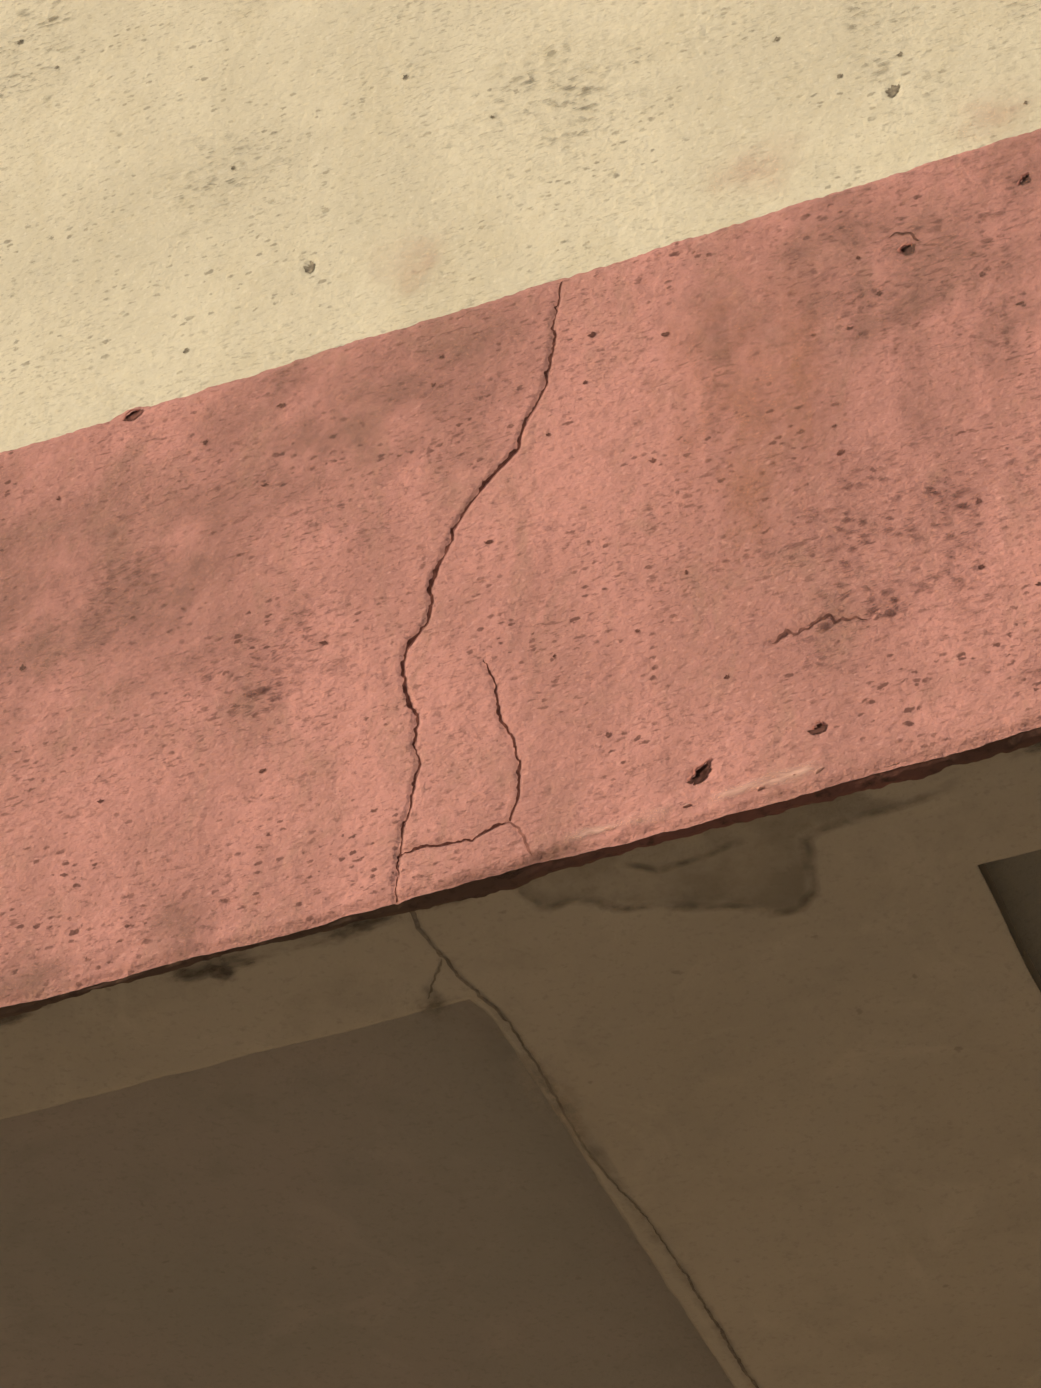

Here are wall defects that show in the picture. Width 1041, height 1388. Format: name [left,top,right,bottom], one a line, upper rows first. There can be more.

crack [395,281,759,1388]